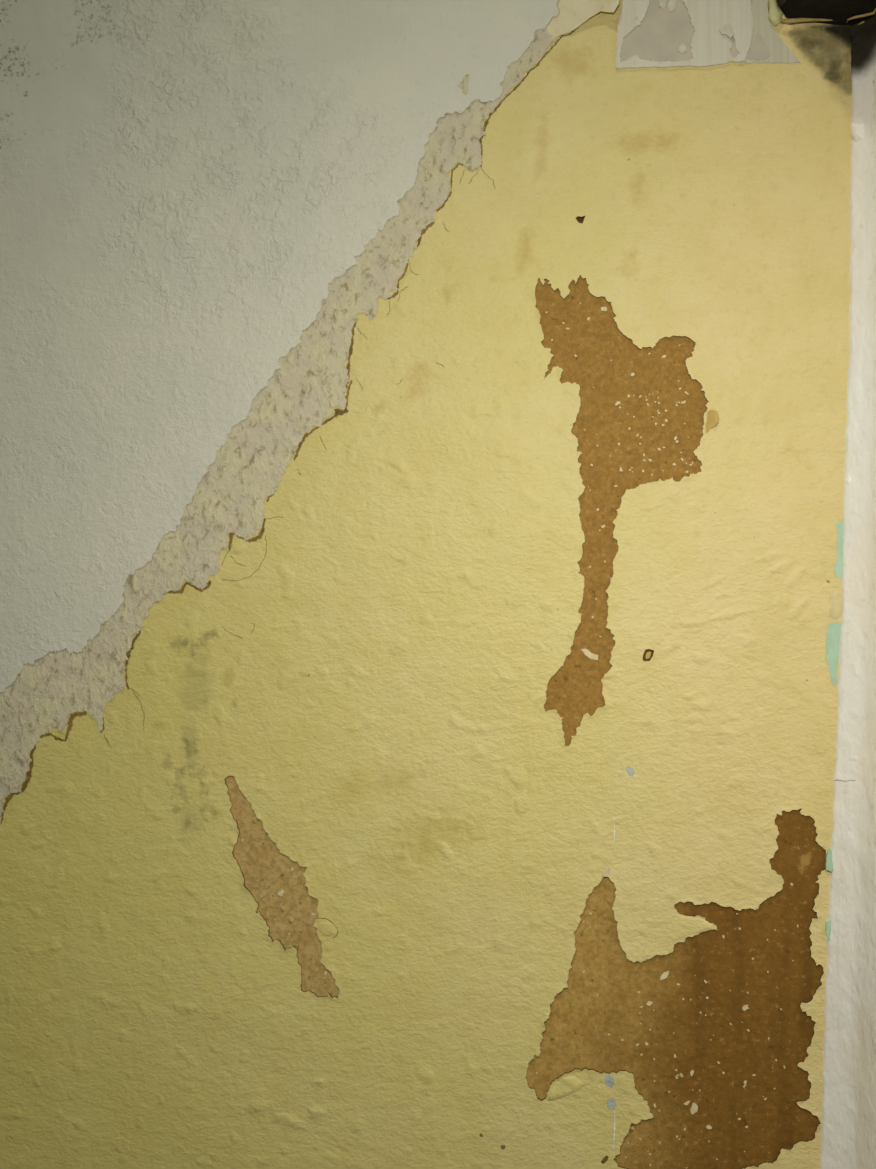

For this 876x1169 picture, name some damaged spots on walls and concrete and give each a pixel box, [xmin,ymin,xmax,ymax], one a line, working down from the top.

peeling [620,0,695,62]
peeling [535,275,719,746]
peeling [225,776,340,997]
peeling [526,809,833,1169]